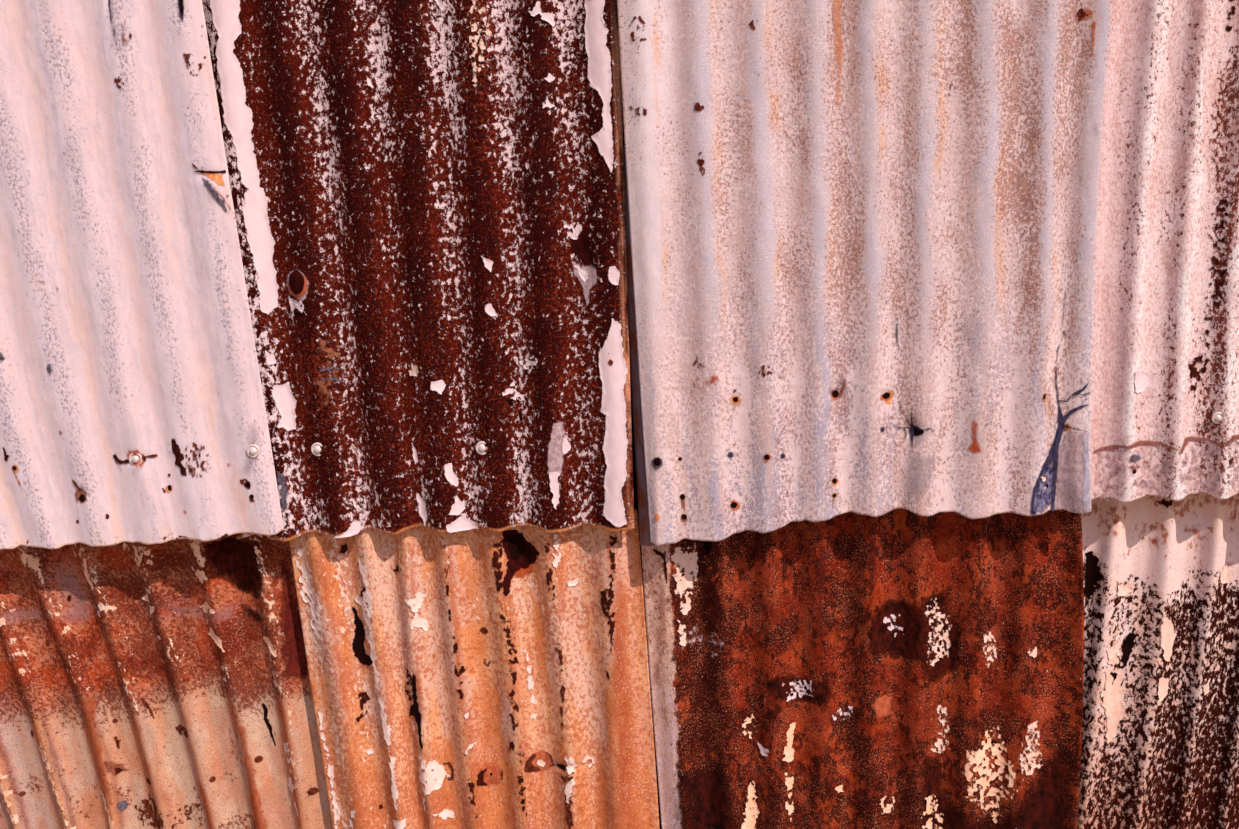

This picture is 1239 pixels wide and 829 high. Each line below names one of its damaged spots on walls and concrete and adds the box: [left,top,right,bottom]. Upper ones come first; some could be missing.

peeling [584,0,614,172]
peeling [210,0,304,320]
rust [564,222,597,305]
rust [1189,197,1228,393]
peeling [444,463,478,533]
peeling [547,422,571,509]
peeling [599,318,628,527]
rust [205,533,263,622]
rust [869,591,962,685]
rust [1110,628,1137,685]
rust [922,749,1076,829]
peeling [962,721,1042,823]